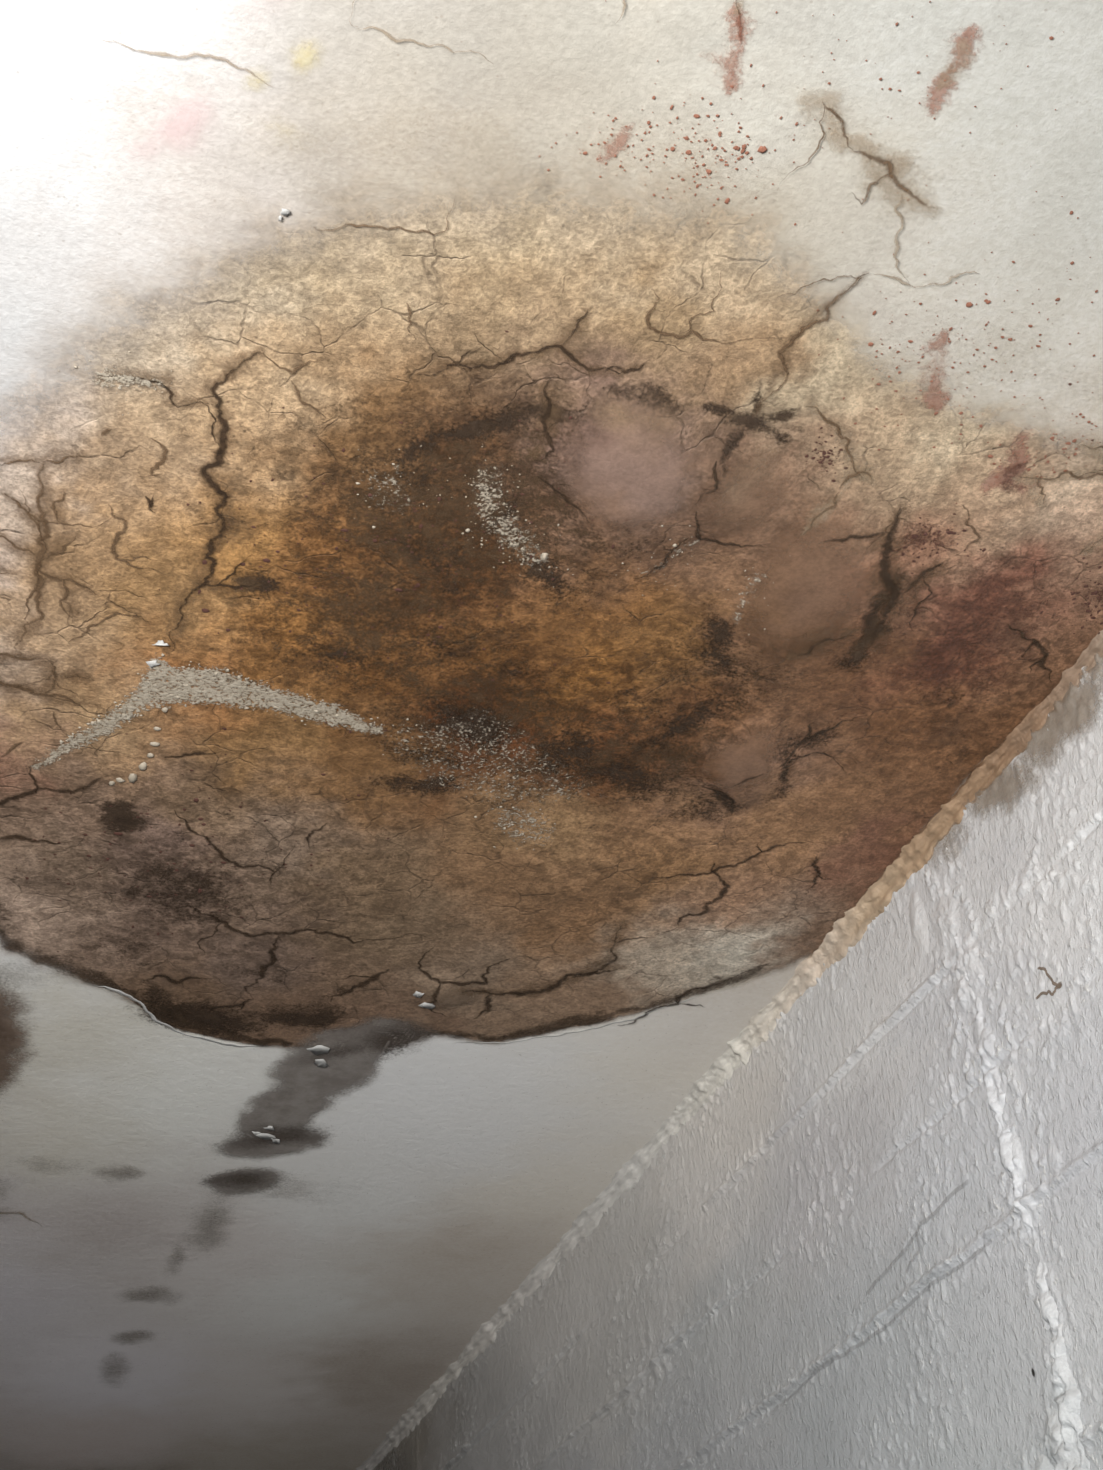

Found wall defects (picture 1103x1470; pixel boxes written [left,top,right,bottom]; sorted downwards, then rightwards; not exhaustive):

corrosion [865,25,1007,119]
crack [424,101,981,657]
crack [1021,445,1103,502]
crack [0,352,326,844]
water stain [0,194,1103,1194]
crack [1008,624,1052,680]
crack [706,716,860,812]
crack [175,811,327,884]
crack [150,841,830,1026]